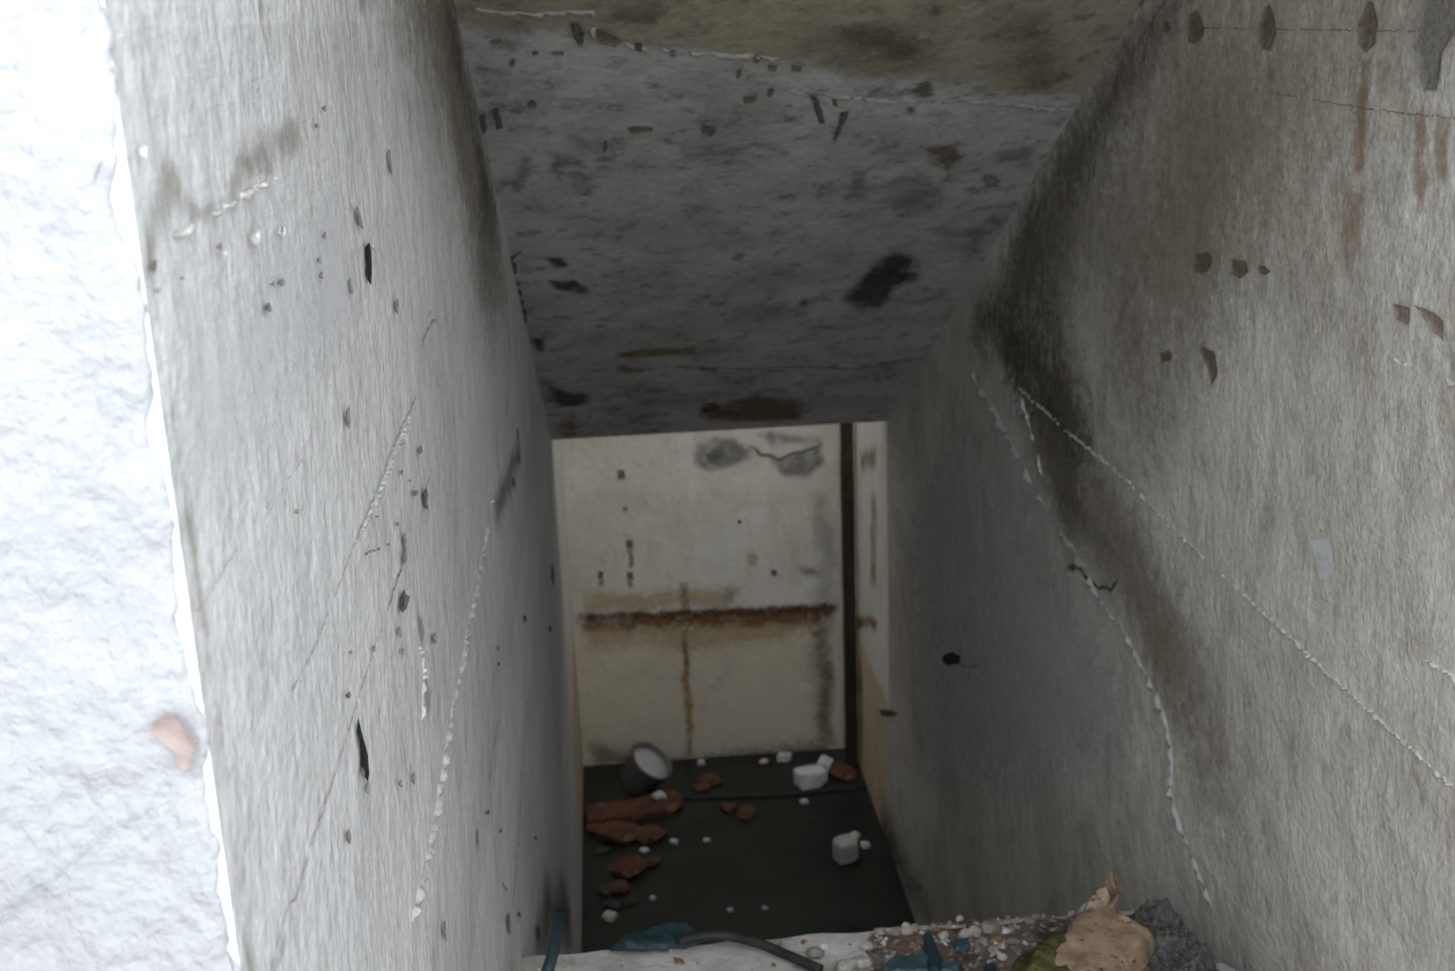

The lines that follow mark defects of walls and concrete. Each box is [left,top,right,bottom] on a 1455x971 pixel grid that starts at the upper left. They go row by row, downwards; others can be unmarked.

water stain [418,0,495,277]
corrosion [1356,78,1367,169]
corrosion [1416,113,1447,196]
water stain [848,253,916,308]
corrosion [583,603,836,753]